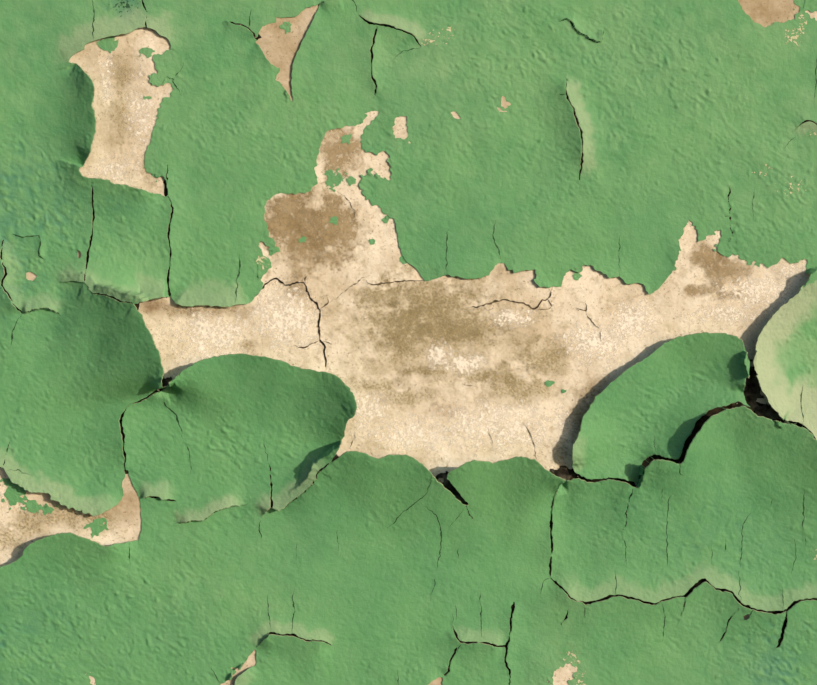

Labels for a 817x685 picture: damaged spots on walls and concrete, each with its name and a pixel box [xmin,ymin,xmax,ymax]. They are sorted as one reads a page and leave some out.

peeling [30,0,184,196]
peeling [255,5,319,102]
crack [352,0,421,93]
peeling [738,0,817,27]
crack [235,259,423,367]
peeling [0,111,817,604]
leakage [350,286,584,464]
leakage [527,300,655,372]
crack [541,387,817,648]
peeling [208,633,376,685]
crack [444,592,515,685]
peeling [547,663,577,685]